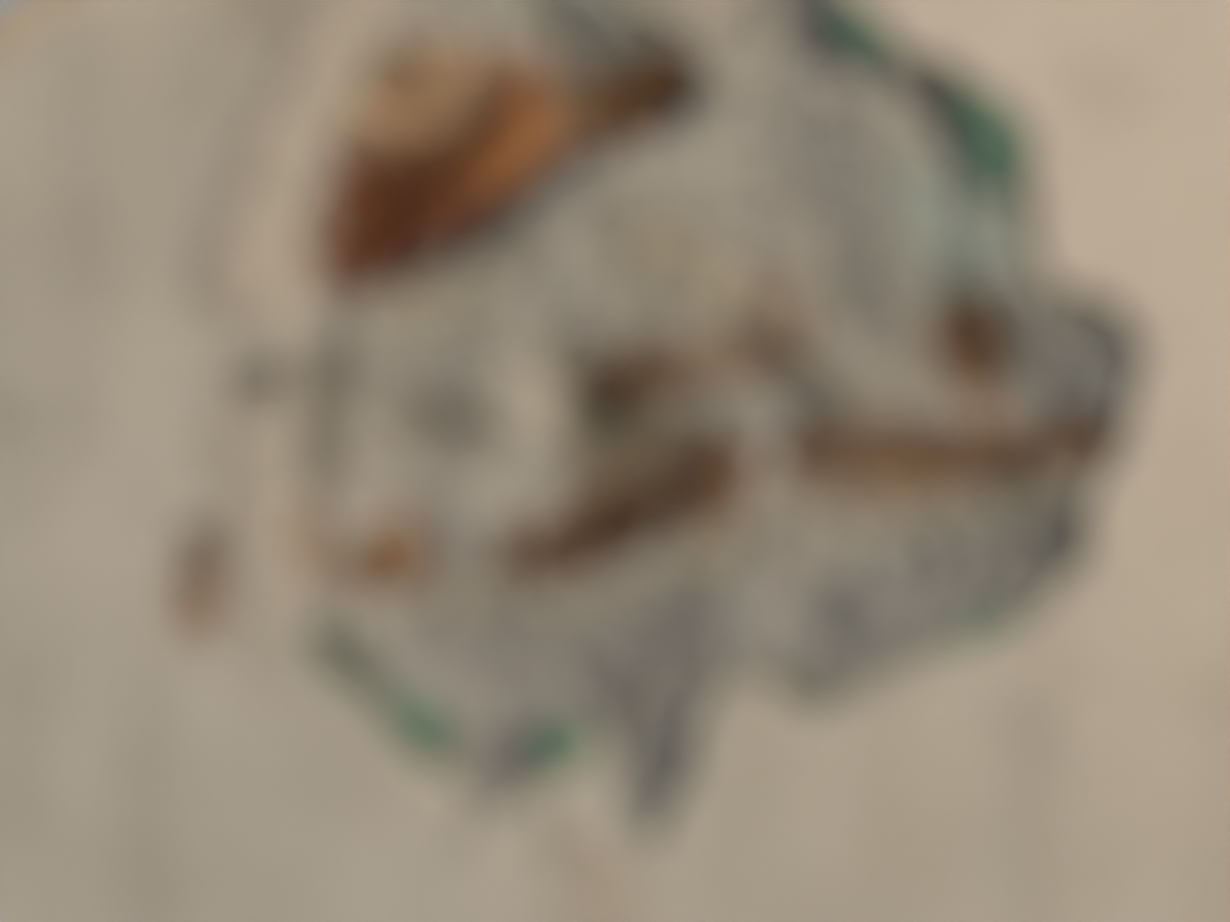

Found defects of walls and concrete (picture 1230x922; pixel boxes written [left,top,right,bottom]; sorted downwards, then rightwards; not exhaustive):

rust [304,41,619,290]
spalling [281,0,1145,844]